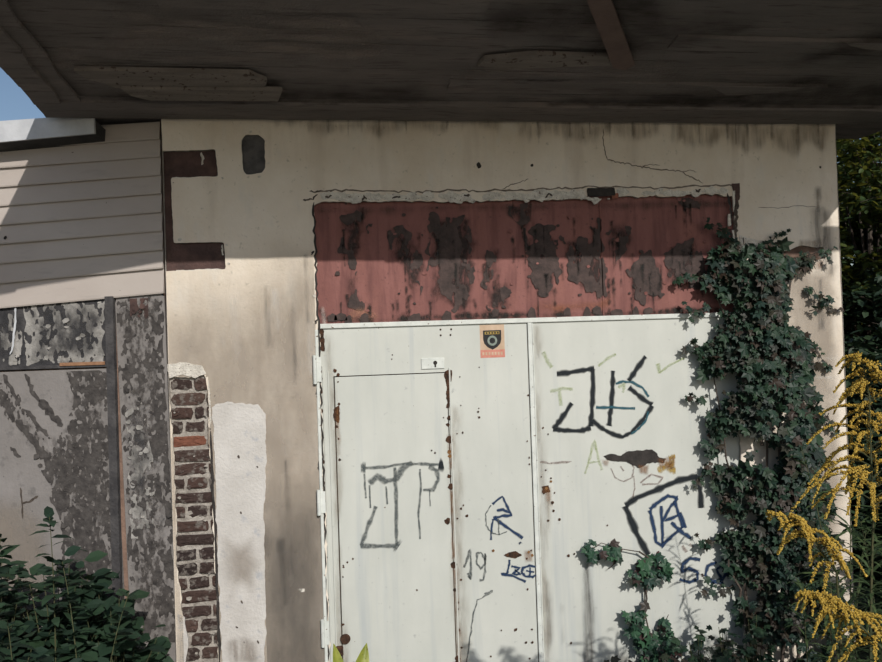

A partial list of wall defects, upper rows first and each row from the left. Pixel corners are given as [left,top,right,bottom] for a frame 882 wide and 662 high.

crack [602,131,702,183]
spalling [315,184,732,315]
peeling [340,289,371,322]
peeling [0,301,112,587]
flaking render [103,296,266,662]
rust [321,403,340,440]
rust [443,370,464,458]